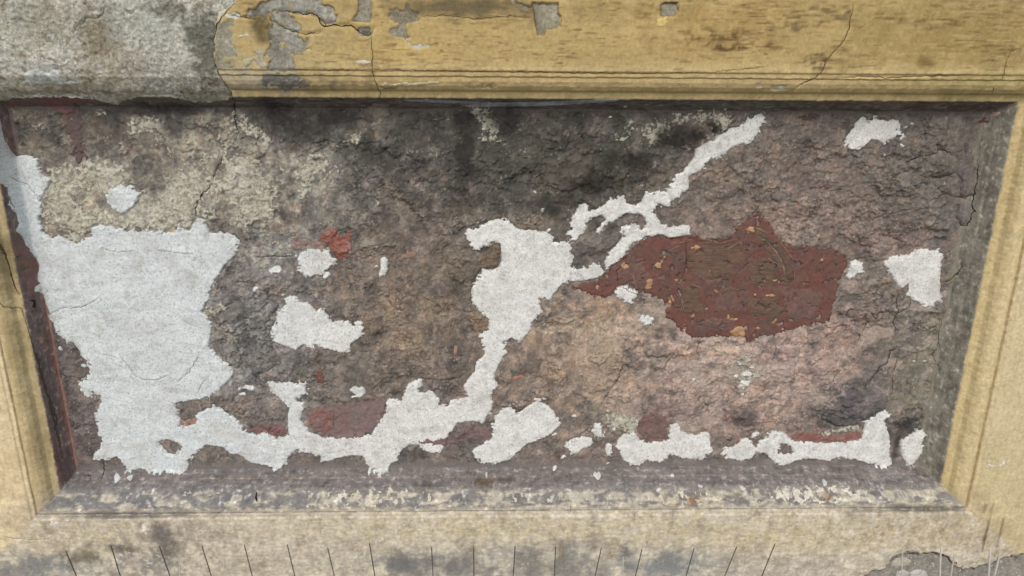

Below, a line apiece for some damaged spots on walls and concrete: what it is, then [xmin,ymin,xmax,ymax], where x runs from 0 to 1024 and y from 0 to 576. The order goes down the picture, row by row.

crack [791,10,964,91]
crack [194,2,763,214]
flaking render [0,0,927,507]
flaking render [883,248,944,308]
peeling [307,487,432,533]